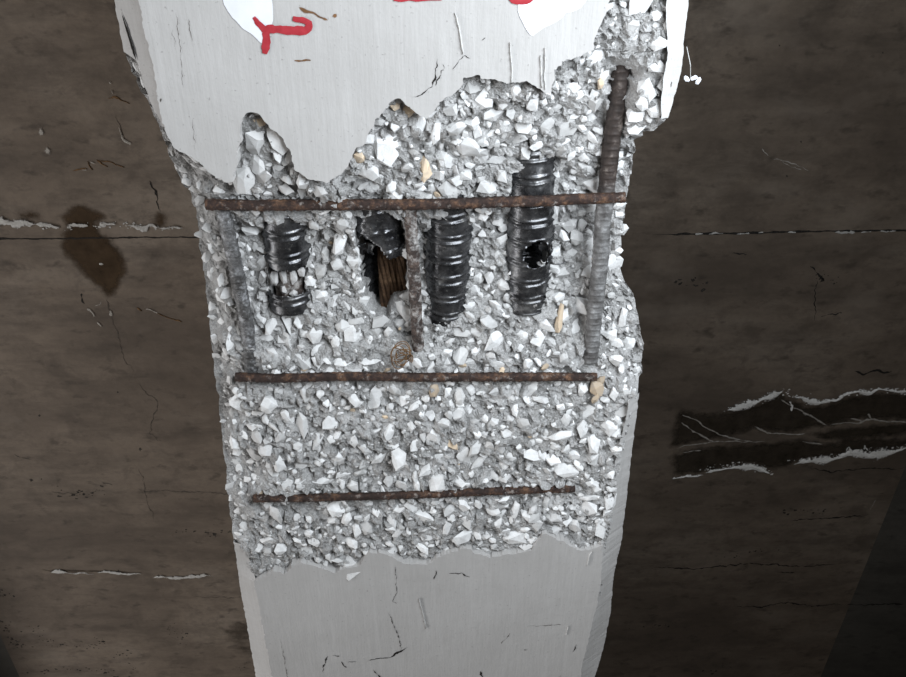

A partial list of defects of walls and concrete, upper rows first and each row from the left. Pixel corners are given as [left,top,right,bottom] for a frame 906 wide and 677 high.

peeling [684,47,701,84]
water stain [0,206,180,295]
spalling [124,0,672,581]
crack [369,567,404,677]